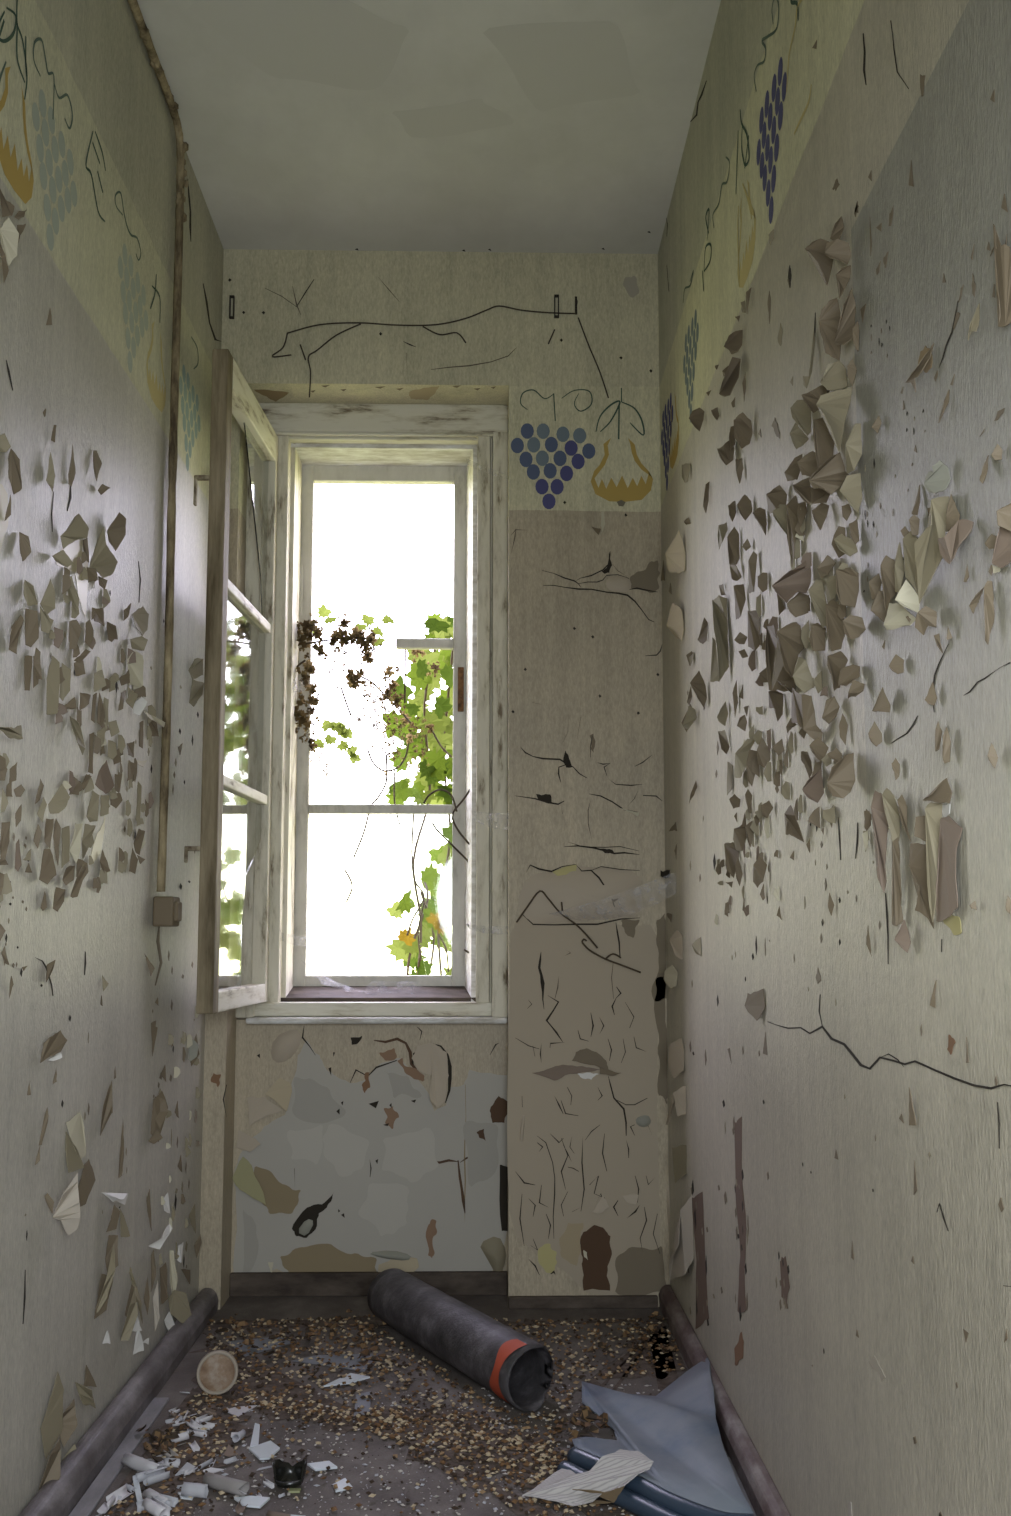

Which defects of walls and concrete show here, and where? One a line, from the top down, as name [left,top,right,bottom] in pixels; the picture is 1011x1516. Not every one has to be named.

peeling [0,189,27,283]
peeling [43,409,110,495]
peeling [661,194,1011,957]
peeling [180,658,204,717]
peeling [0,512,193,998]
peeling [664,913,701,988]
peeling [533,1048,619,1081]
crack [769,994,1011,1149]
peeling [35,998,202,1354]
flaking render [232,1041,508,1273]
spalling [551,1223,612,1291]
peeling [38,1365,97,1491]